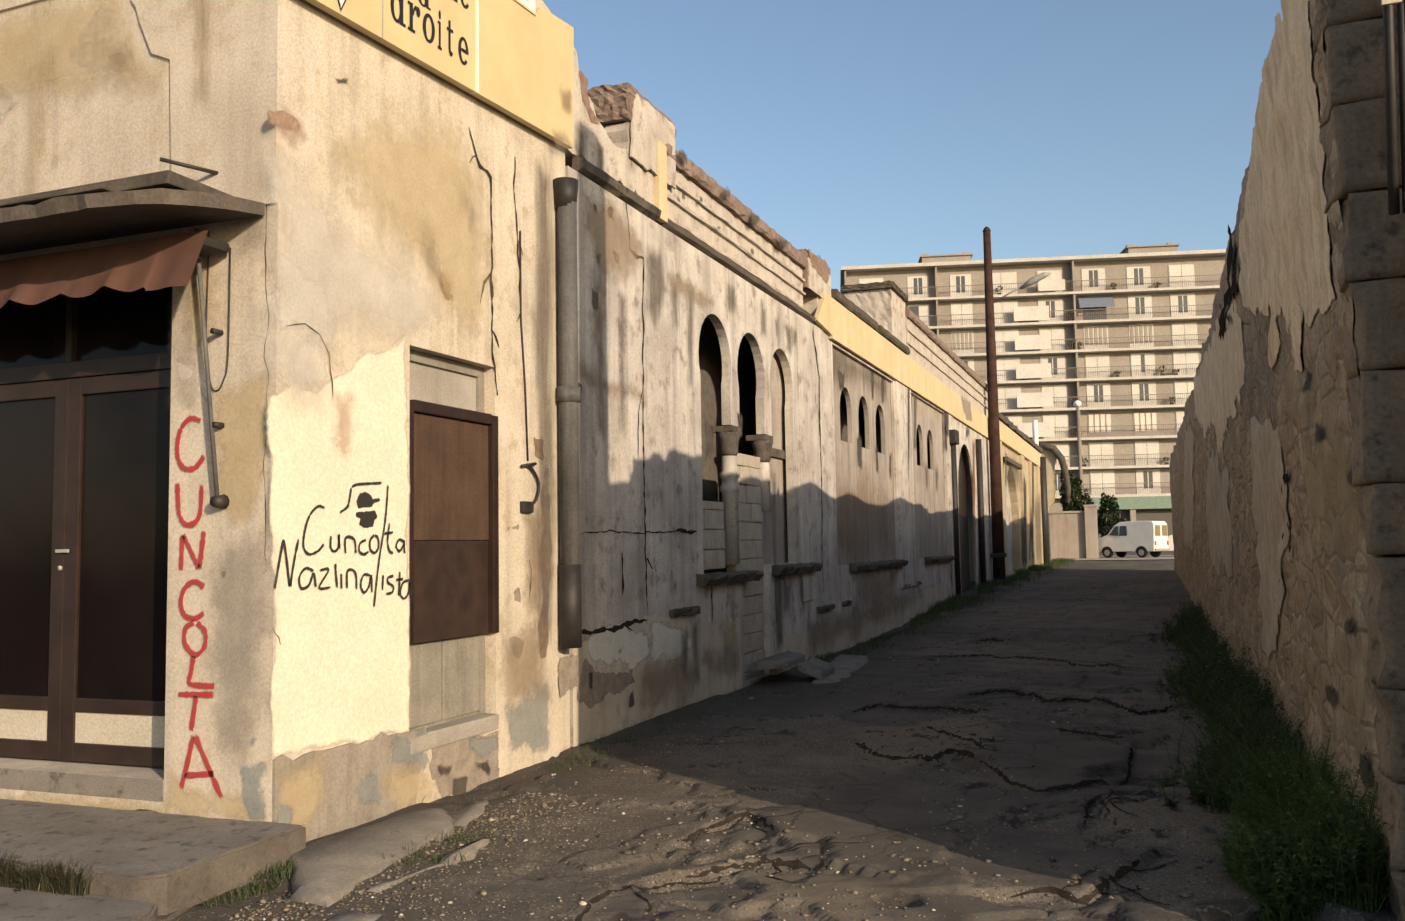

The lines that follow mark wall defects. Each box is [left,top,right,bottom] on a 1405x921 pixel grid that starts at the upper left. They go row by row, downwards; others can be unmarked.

damp [292,211,426,323]
damp [353,127,477,319]
crack [469,128,523,395]
damp [590,205,706,321]
crack [580,203,697,635]
damp [705,422,714,458]
peeling [167,256,695,824]
peeling [23,794,150,810]